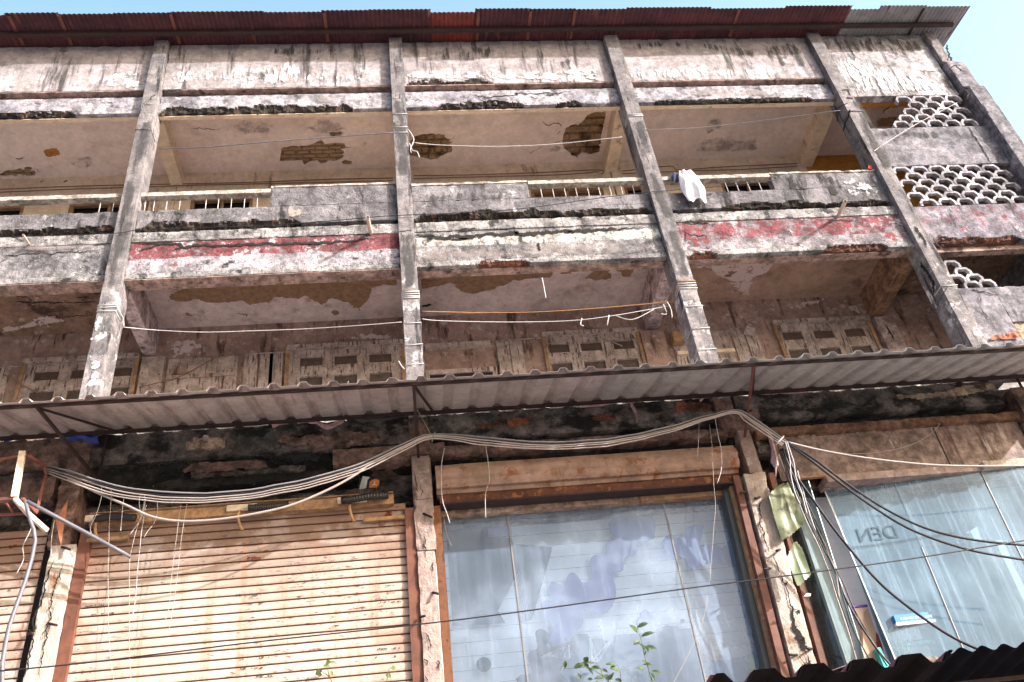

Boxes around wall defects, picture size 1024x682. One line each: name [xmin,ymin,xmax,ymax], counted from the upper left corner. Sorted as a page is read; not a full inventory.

water stain [107,72,140,88]
water stain [170,47,375,85]
spalling [0,110,76,120]
spalling [159,89,353,117]
spalling [280,130,352,166]
spalling [409,132,454,159]
spalling [555,99,607,157]
spalling [653,96,811,106]
crack [136,211,645,251]
peeling [168,280,397,316]
crack [757,500,811,664]
crack [22,561,65,680]